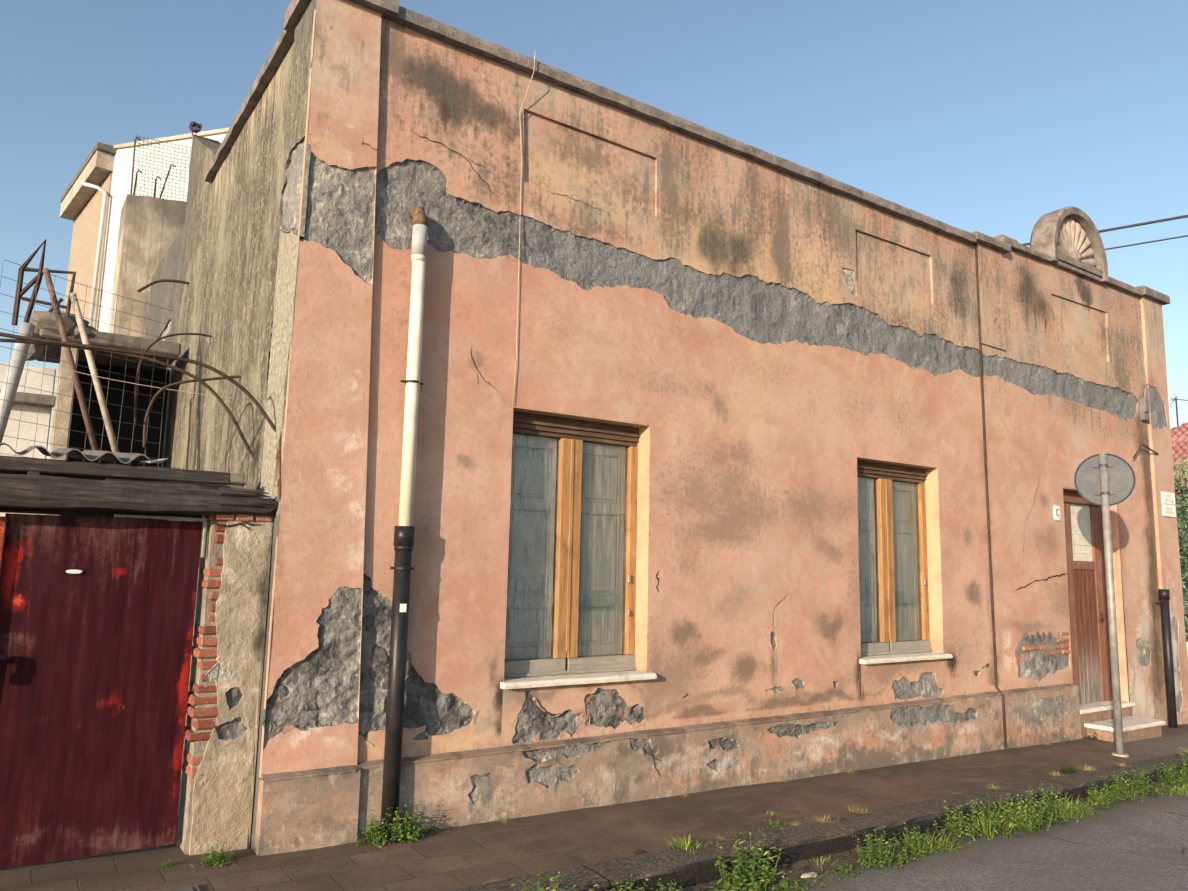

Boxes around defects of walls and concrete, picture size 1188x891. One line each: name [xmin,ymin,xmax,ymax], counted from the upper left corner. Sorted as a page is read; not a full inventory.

water stain [406,63,508,127]
crack [413,132,494,194]
spalling [282,140,1167,430]
crack [1014,573,1067,591]
spalling [263,573,392,749]
spalling [1014,631,1070,682]
spalling [206,663,248,740]
spalling [403,649,479,740]
spalling [890,672,977,729]
spalling [512,687,658,788]
spalling [705,737,739,771]
spalling [468,772,493,804]